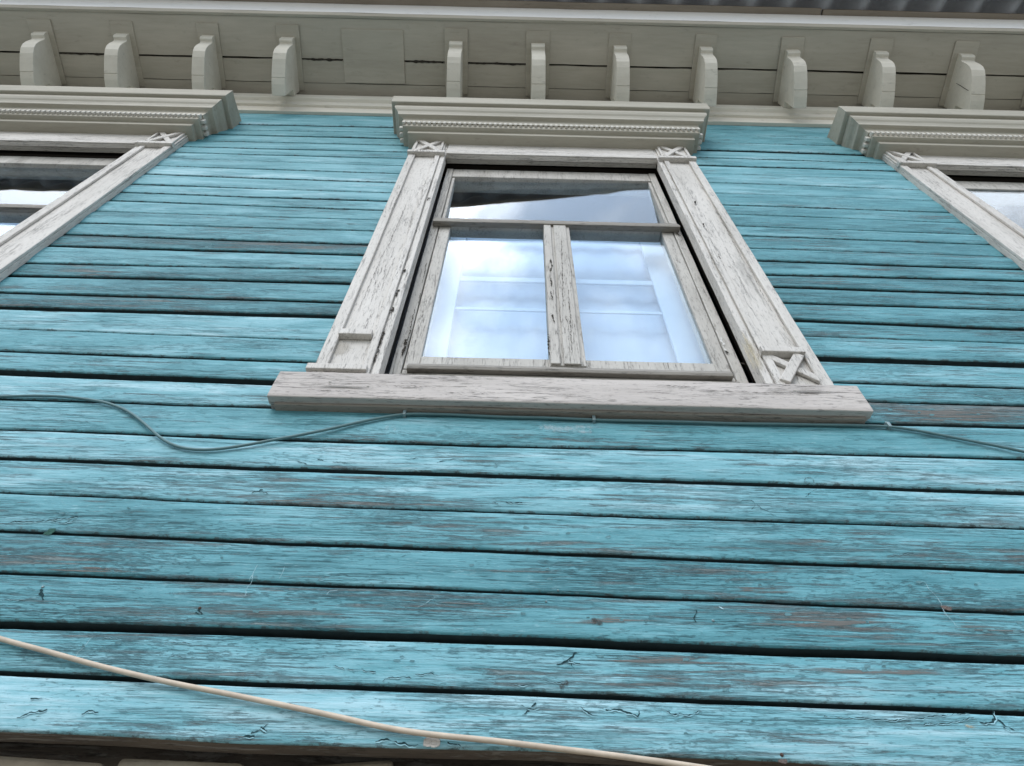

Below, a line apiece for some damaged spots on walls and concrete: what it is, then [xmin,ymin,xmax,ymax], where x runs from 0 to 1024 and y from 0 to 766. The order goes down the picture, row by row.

peeling [551,614,661,624]
peeling [748,611,896,632]
peeling [597,655,722,664]
peeling [803,665,943,675]
crack [515,652,580,714]
crack [17,698,47,718]
crack [581,707,702,719]
crack [824,713,1014,732]
crack [240,725,266,739]